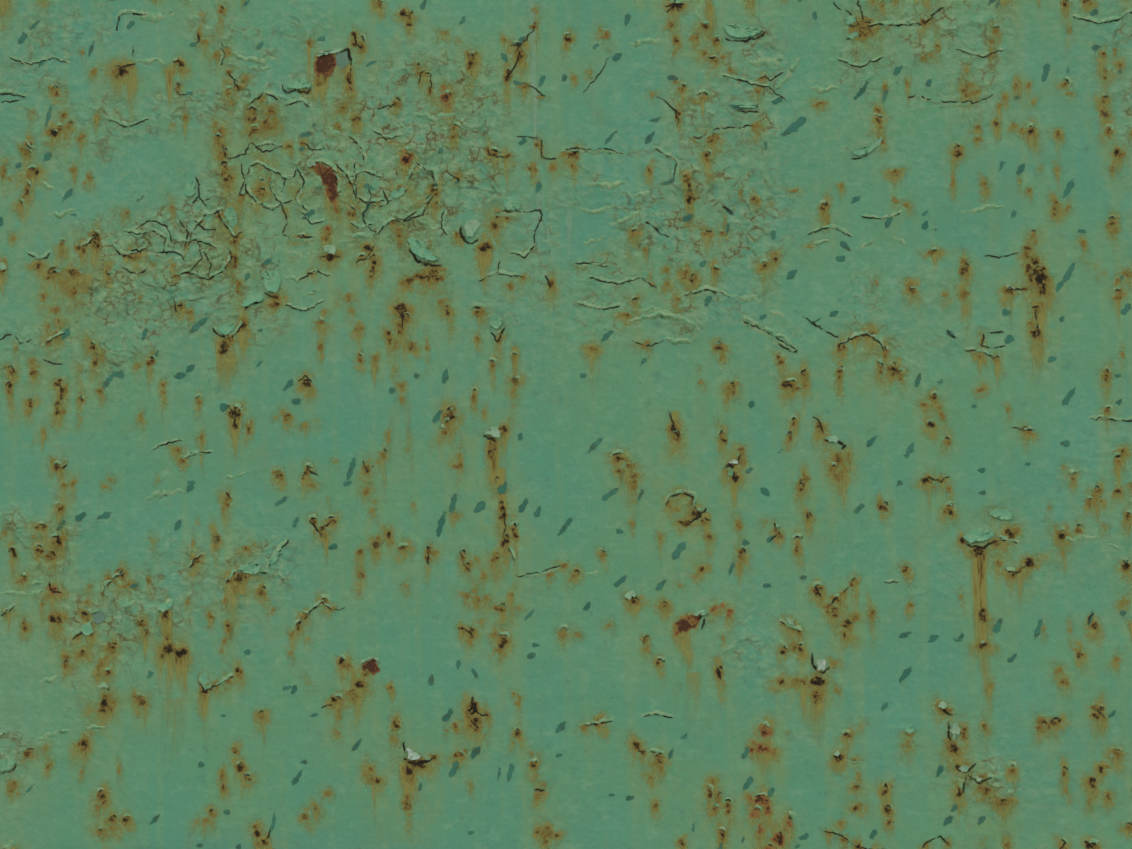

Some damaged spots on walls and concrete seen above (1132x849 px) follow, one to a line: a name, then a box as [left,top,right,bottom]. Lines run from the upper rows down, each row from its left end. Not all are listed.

crack [1071,7,1132,36]
peeling [282,47,376,106]
crack [721,73,786,100]
crack [122,89,450,289]
crack [284,268,331,312]
peeling [394,223,446,298]
crack [574,262,839,354]
corrosion [941,251,973,318]
corrosion [985,230,1056,360]
peeling [956,509,1022,686]
peeling [442,693,492,759]
peeling [397,742,459,828]